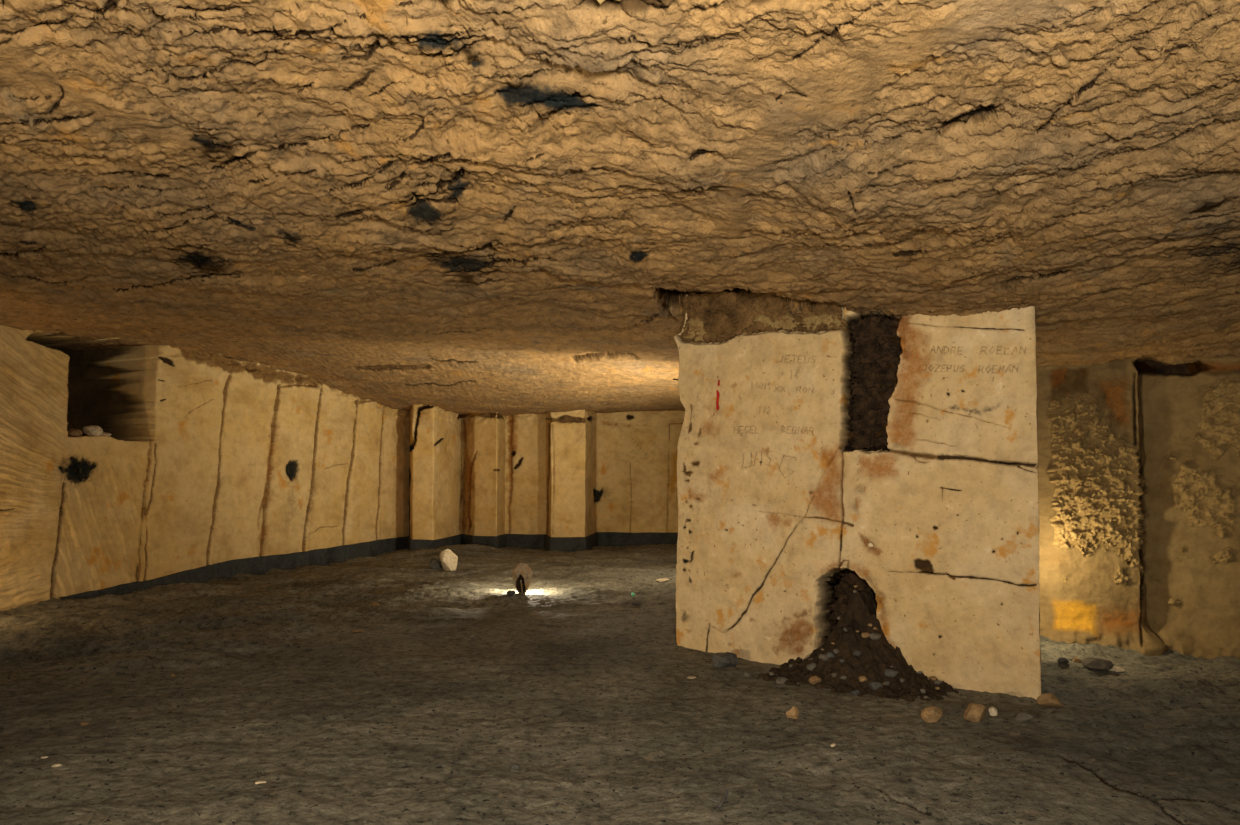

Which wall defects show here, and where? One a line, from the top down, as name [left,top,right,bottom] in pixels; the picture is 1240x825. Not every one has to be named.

crack [706,452,854,652]
crack [891,559,1037,586]